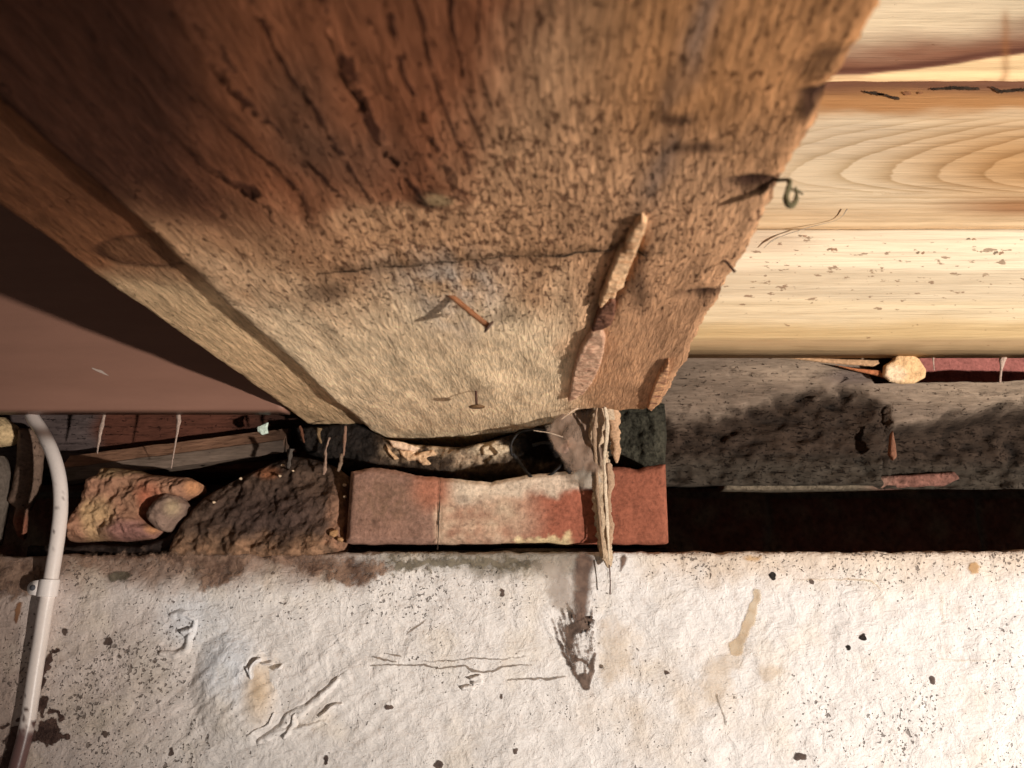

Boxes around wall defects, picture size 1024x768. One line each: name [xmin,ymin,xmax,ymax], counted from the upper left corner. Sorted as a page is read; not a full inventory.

crack [371,620,566,681]
damp [730,589,761,656]